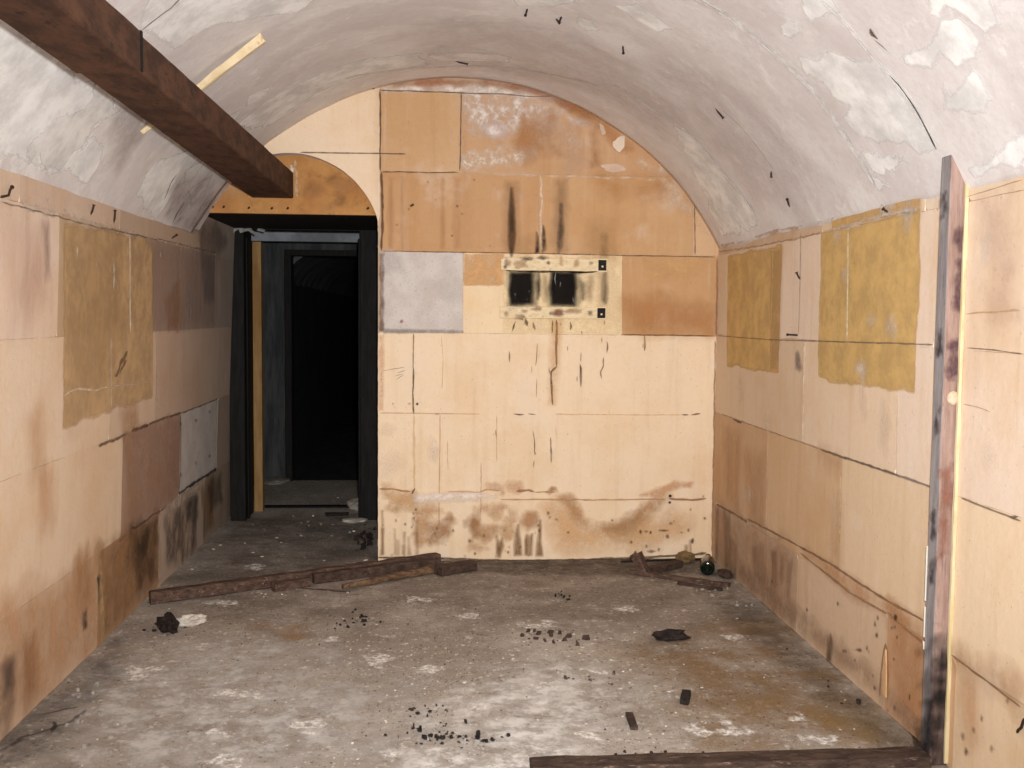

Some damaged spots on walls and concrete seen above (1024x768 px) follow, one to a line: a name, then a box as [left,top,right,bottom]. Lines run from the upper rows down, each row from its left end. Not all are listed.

peeling [903,0,998,68]
leakage [385,84,555,167]
peeling [799,52,936,190]
peeling [969,134,1024,177]
crack [290,90,933,561]
leakage [392,493,486,544]
leakage [470,518,510,540]
leakage [524,483,691,572]
leakage [4,485,199,719]